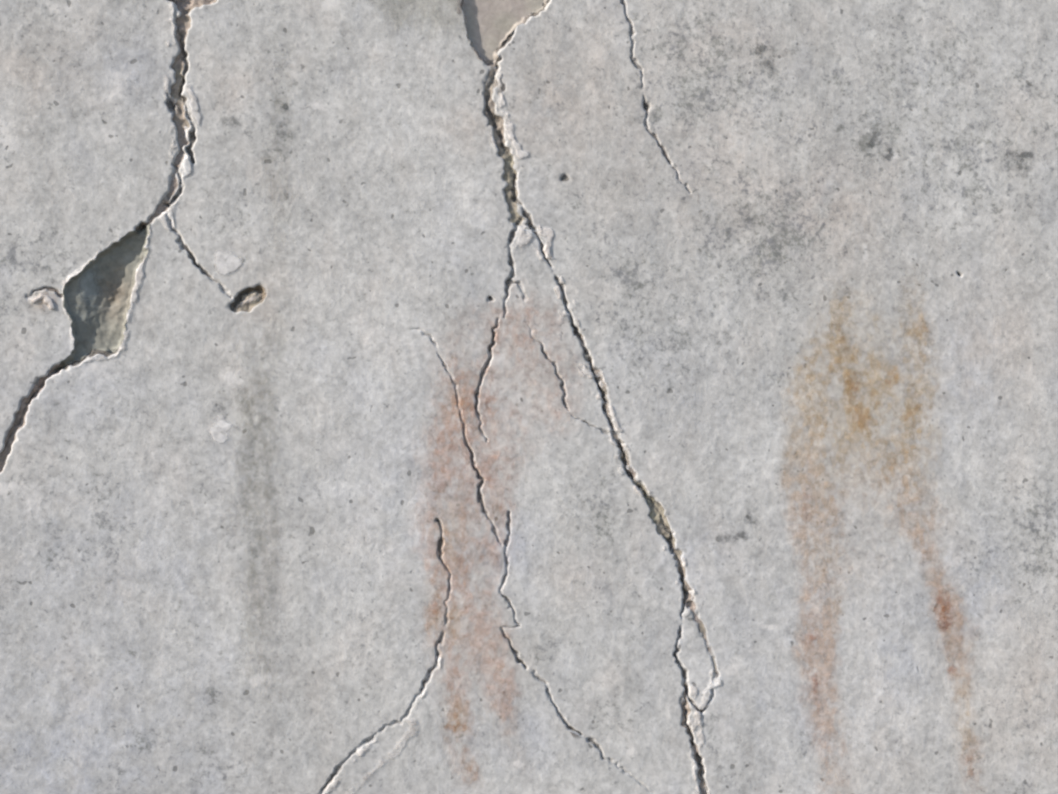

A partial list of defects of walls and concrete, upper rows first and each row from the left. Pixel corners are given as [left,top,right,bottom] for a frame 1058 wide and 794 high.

spalling [461,0,550,68]
crack [136,0,217,277]
spalling [32,222,151,372]
crack [0,364,65,472]
crack [465,440,484,508]
crack [475,330,495,415]
crack [484,63,722,794]
crack [435,519,443,562]
crack [408,641,442,734]
crack [322,740,393,794]